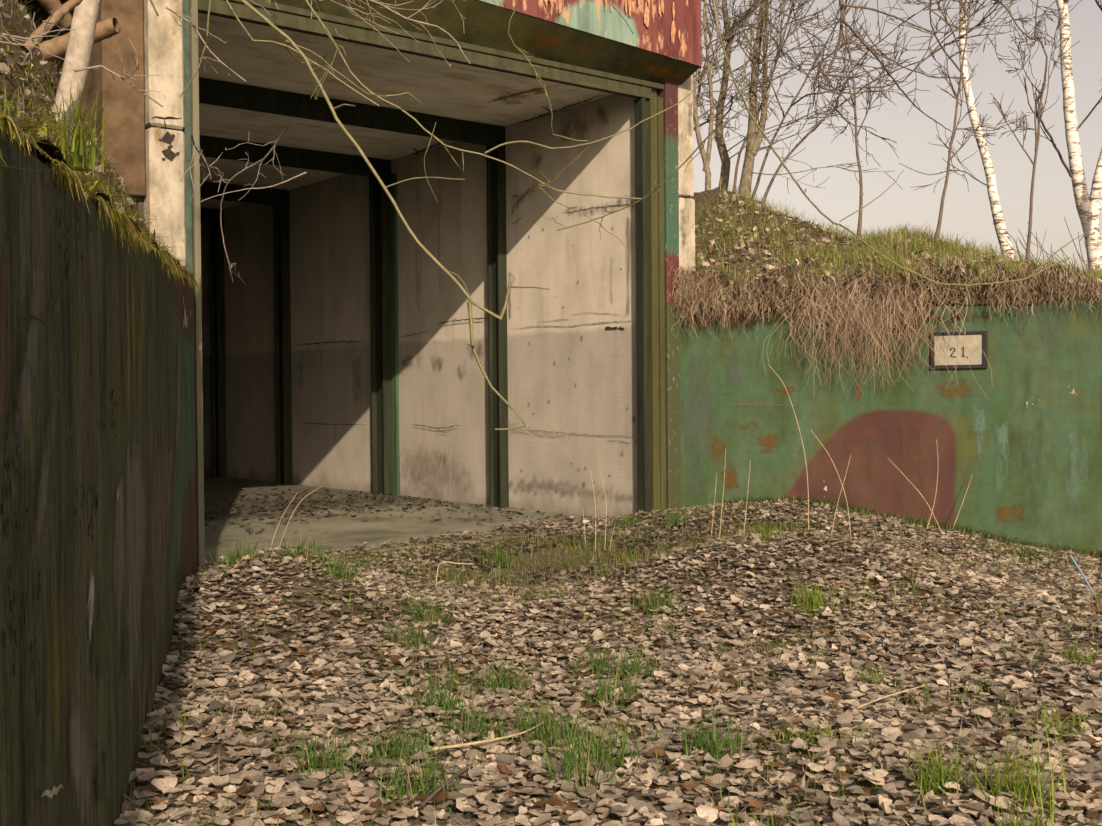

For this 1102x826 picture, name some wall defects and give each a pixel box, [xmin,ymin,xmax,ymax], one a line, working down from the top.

peeling [625,0,680,44]
crack [565,202,634,213]